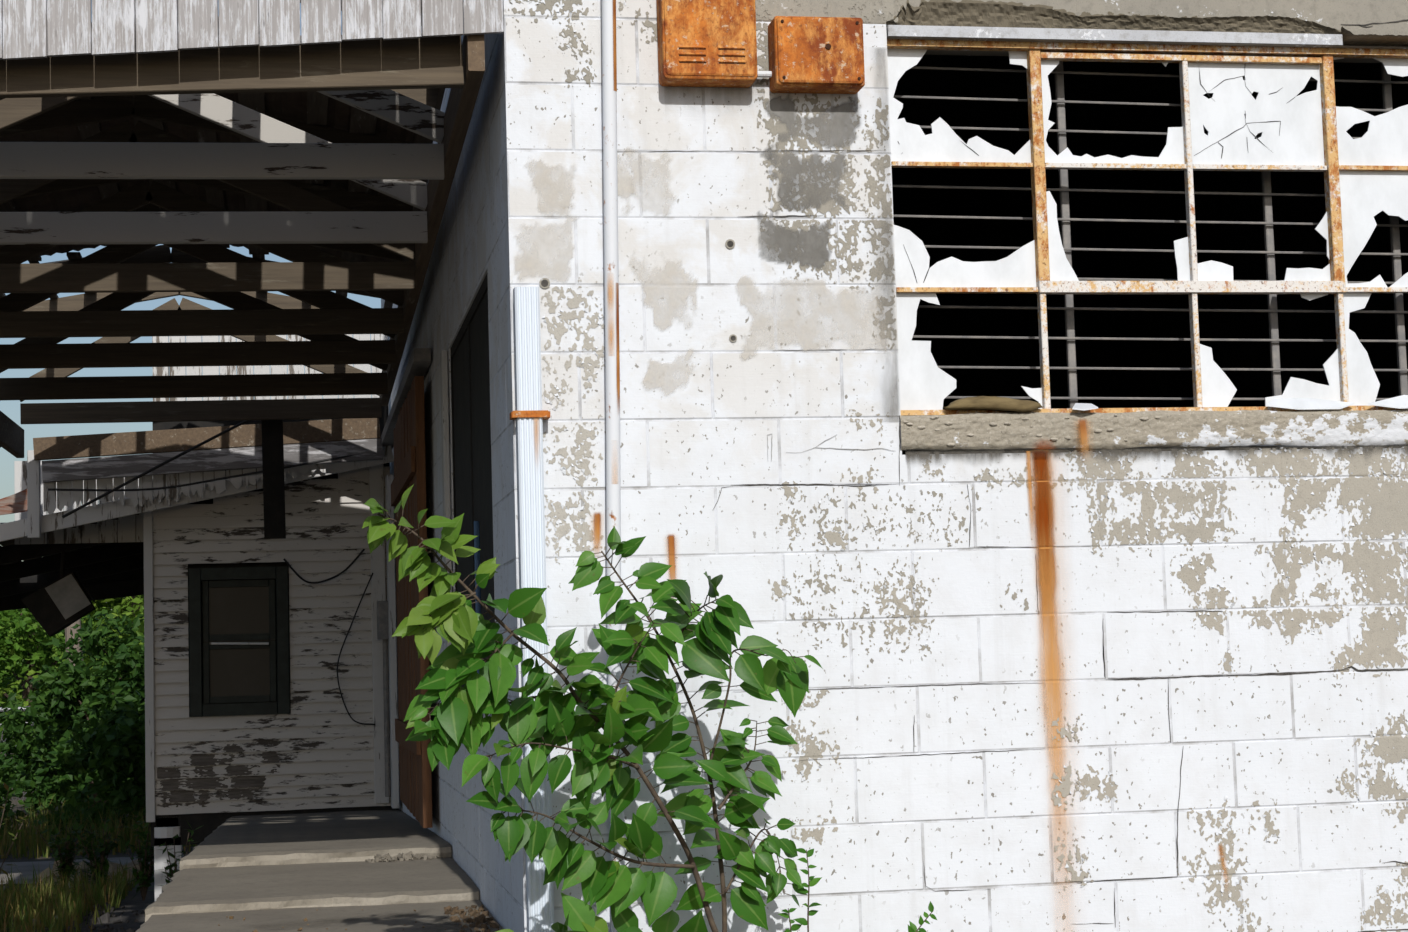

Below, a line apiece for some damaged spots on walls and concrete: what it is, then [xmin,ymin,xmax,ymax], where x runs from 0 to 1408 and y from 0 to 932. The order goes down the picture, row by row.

peeling [508,0,597,90]
peeling [617,0,658,48]
peeling [541,277,606,565]
rust [1027,442,1060,760]
peeling [768,406,1408,680]
peeling [1336,709,1408,828]
peeling [1177,796,1283,932]
peeling [1325,861,1408,932]